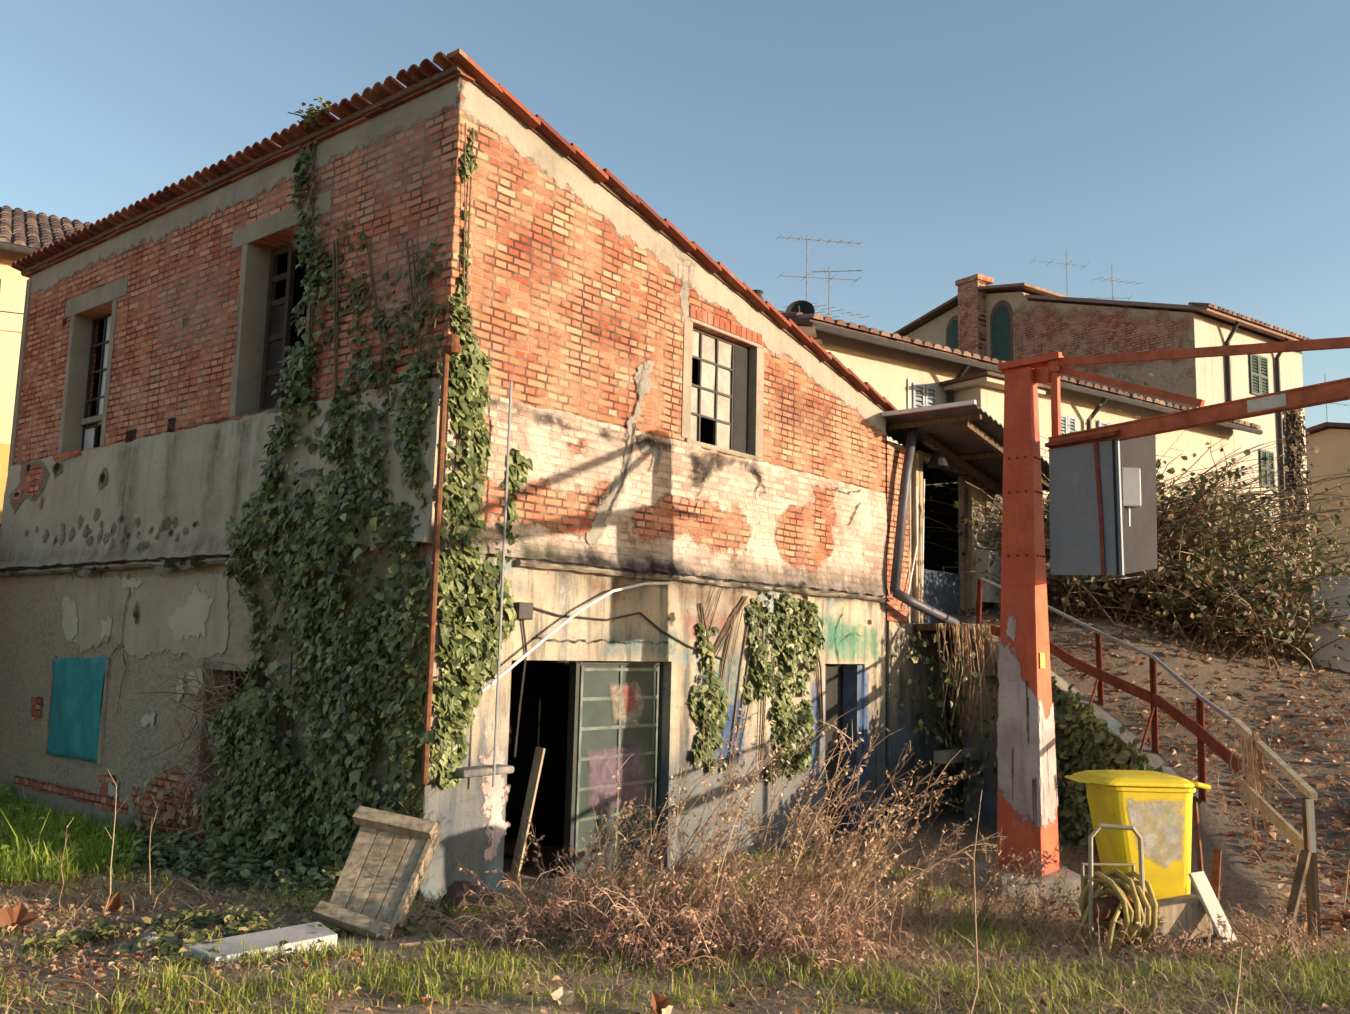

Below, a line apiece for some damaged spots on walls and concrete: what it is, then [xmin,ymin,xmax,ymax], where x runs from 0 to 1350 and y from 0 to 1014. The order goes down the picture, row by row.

flaking render [10,448,81,513]
flaking render [24,508,198,552]
flaking render [476,416,494,448]
flaking render [472,475,611,537]
crack [586,360,653,547]
leakage [602,430,672,449]
flaking render [626,494,752,556]
flaking render [775,485,837,574]
leakage [527,551,871,600]
flaking render [54,557,229,702]
peeling [996,607,1058,829]
flaking render [14,765,195,834]